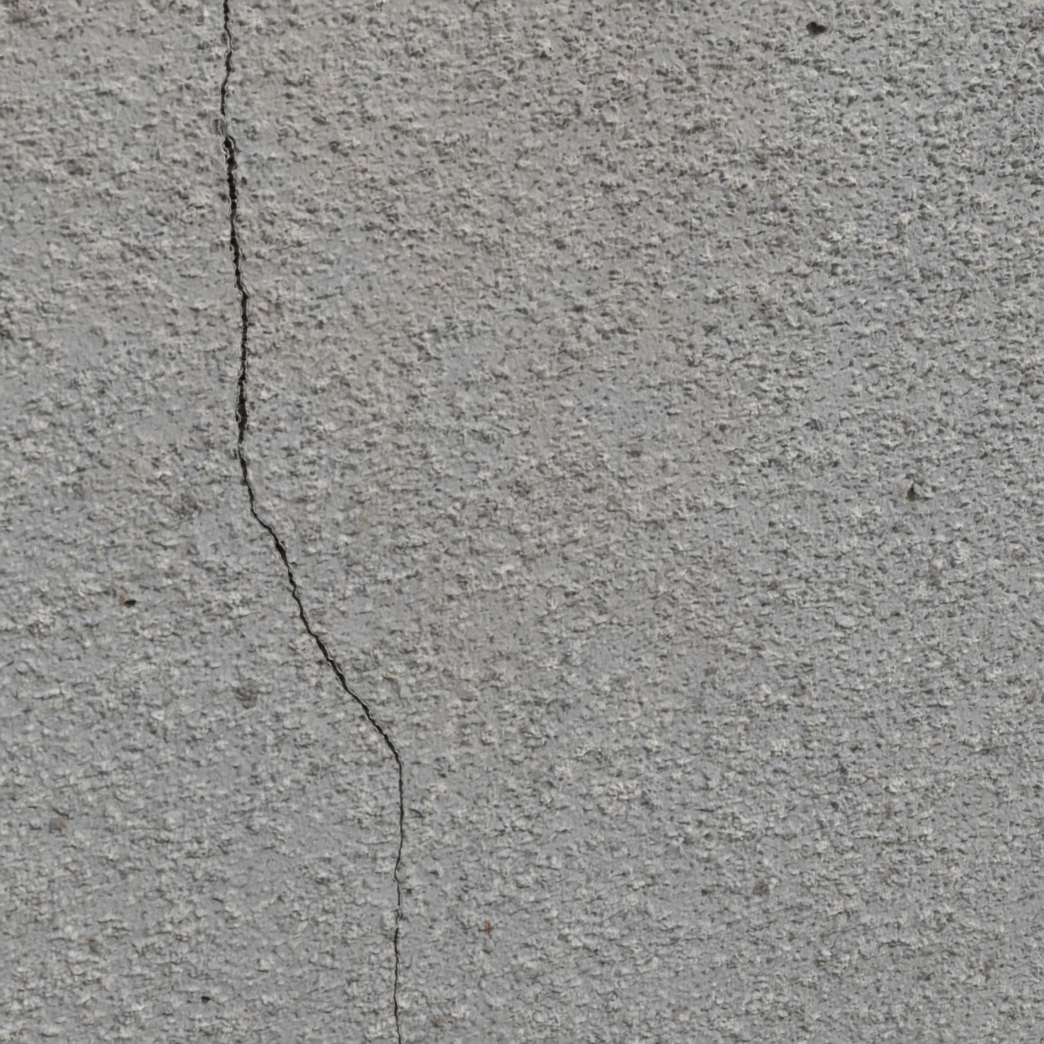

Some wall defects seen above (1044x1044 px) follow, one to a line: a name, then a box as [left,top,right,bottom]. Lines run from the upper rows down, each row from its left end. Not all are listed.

crack [211,0,412,1044]